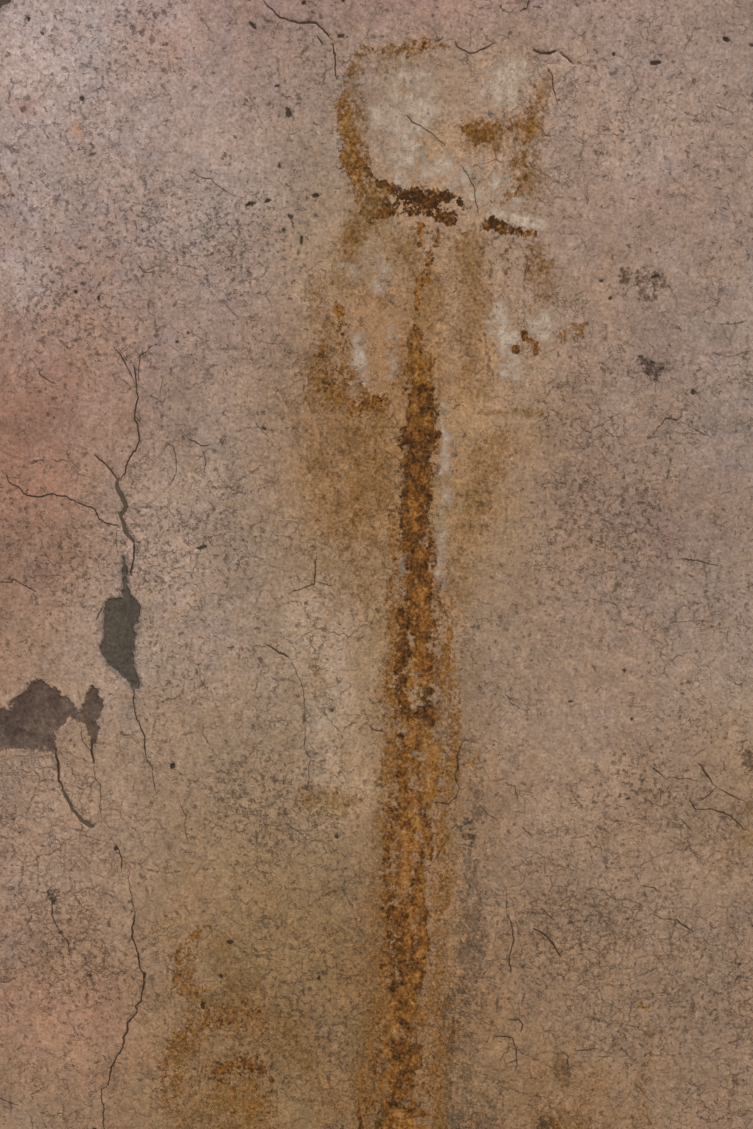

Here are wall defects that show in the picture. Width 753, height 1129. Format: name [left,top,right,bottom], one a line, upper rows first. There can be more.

crack [264,1,337,78]
corrosion [460,84,542,203]
corrosion [482,215,537,280]
corrosion [313,301,390,417]
corrosion [512,330,539,355]
crack [6,344,157,576]
crack [170,437,208,483]
spalling [100,556,141,690]
corrosion [337,92,479,1129]
spalling [0,679,104,754]
crack [133,688,155,788]
crack [55,729,145,1129]